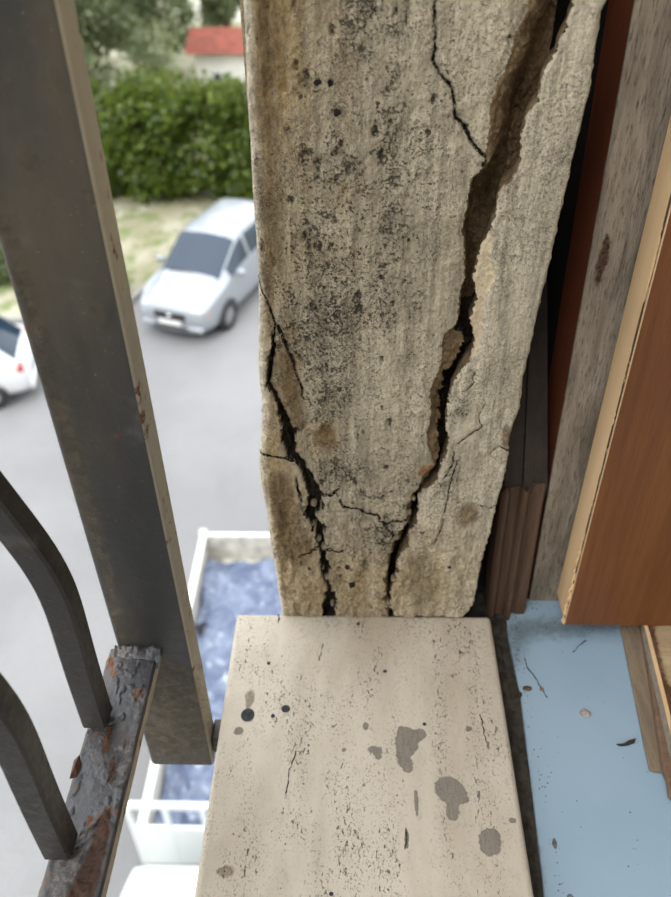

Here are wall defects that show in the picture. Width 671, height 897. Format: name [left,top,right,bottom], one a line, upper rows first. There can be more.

crack [431,0,487,172]
crack [259,280,475,616]
rust [102,725,116,784]
rust [65,810,111,897]